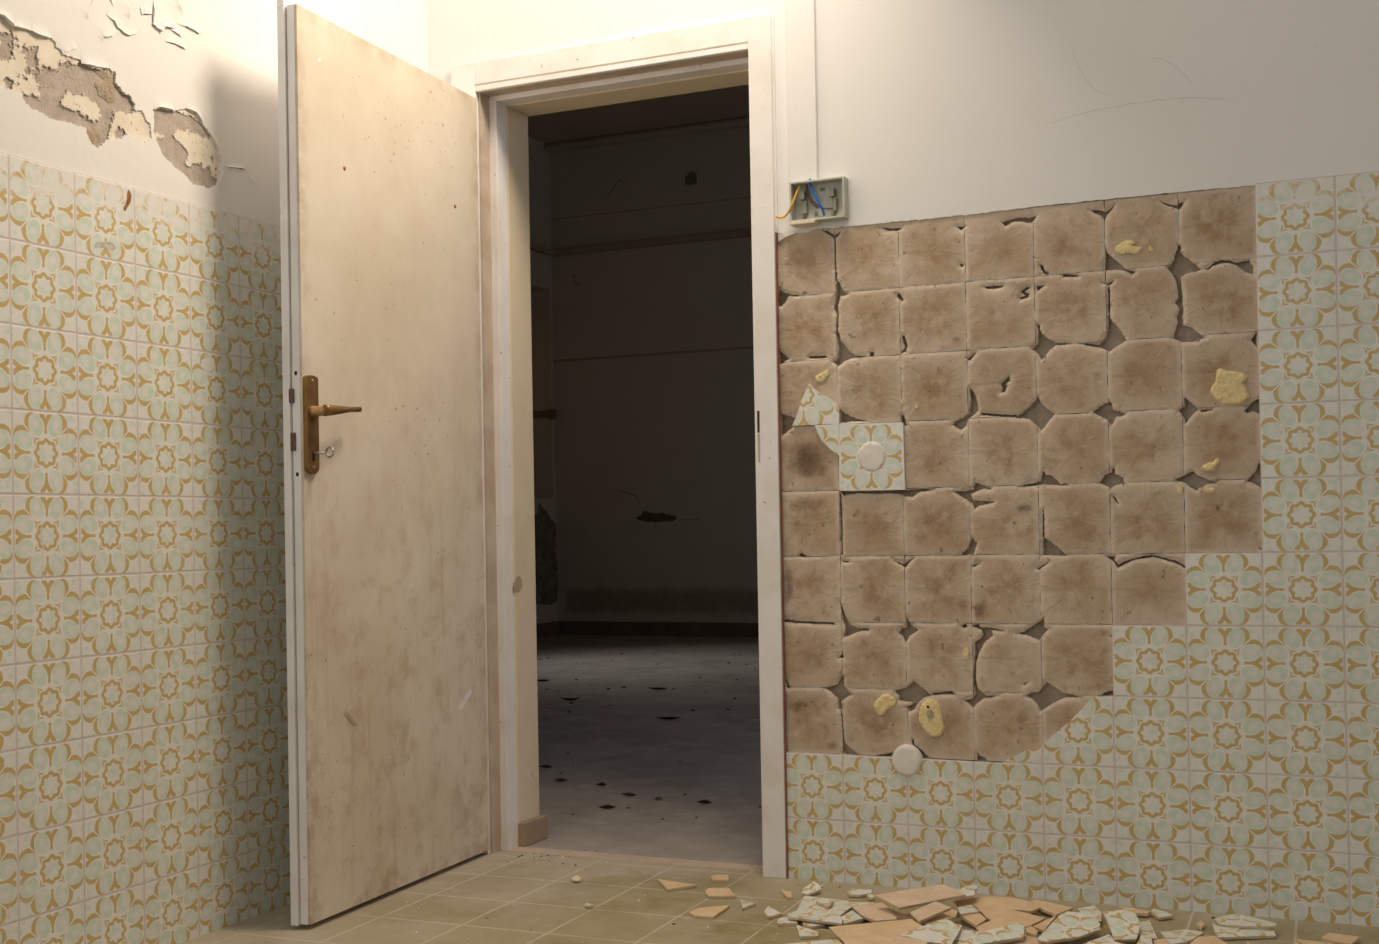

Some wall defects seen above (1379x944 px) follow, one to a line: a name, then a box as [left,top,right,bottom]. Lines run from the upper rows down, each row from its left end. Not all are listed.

flaking render [0,3,229,193]
spalling [513,503,558,605]
peeling [777,186,1262,762]